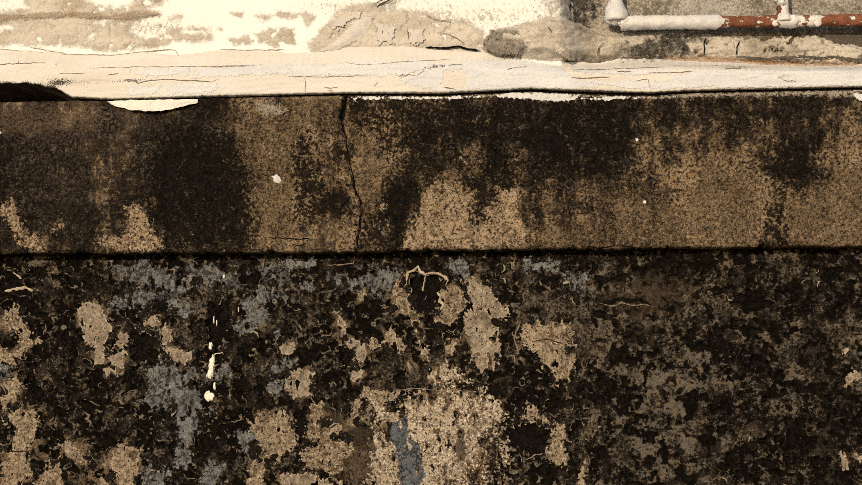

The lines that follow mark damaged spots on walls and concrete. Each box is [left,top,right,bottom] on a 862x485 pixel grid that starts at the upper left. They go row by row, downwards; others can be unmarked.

corrosion [717,5,782,30]
corrosion [821,14,862,27]
peeling [255,97,287,117]
peeling [107,58,862,111]
crack [0,14,862,255]
water stain [139,124,261,253]
water stain [286,92,639,252]
water stain [757,131,831,247]
water stain [414,335,474,387]
water stain [337,448,371,485]
water stain [435,416,502,485]